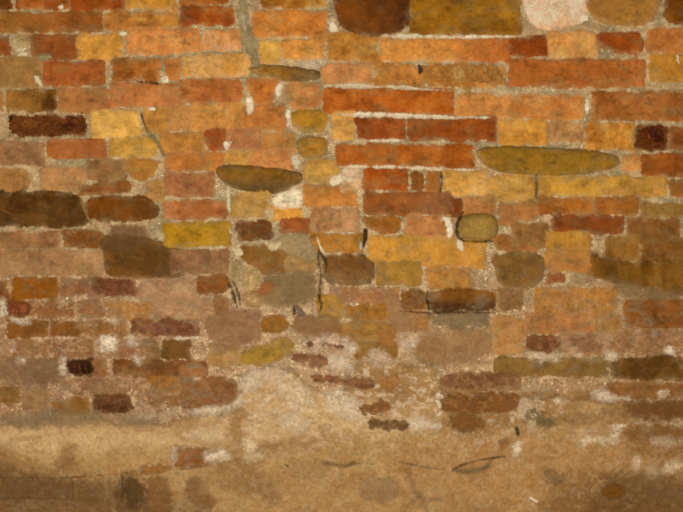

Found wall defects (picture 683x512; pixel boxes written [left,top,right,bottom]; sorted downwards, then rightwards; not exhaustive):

crack [141,113,164,156]
crack [318,250,327,310]
efflorescence [303,334,357,370]
efflorescence [369,349,391,367]
efflorescence [193,364,314,414]
efflorescence [326,390,366,422]
efflorescence [409,393,443,429]
efflorescence [590,390,630,401]
efflorescence [204,450,230,463]
efflorescence [243,439,263,462]
efflorescence [579,424,625,447]
efflorescence [649,460,682,475]